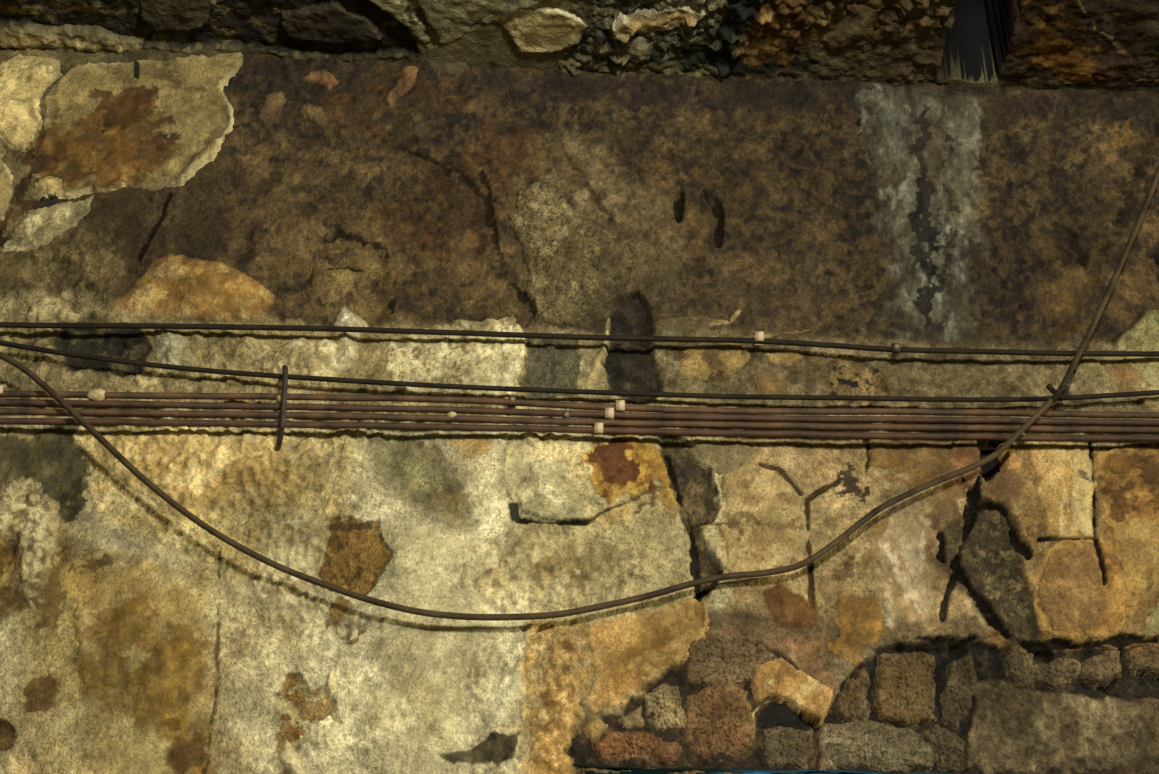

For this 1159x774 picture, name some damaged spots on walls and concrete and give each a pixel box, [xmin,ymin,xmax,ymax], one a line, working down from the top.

efflorescence [859,82,982,345]
flaking render [0,538,20,616]
crack [202,609,220,774]
crack [509,502,623,525]
flaking render [583,435,1159,774]
crack [913,442,1159,658]